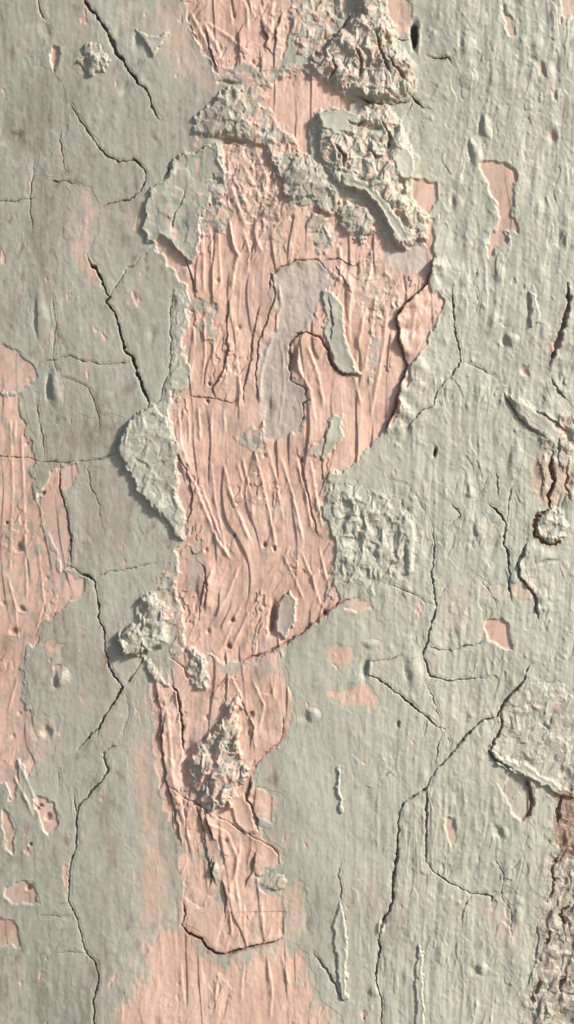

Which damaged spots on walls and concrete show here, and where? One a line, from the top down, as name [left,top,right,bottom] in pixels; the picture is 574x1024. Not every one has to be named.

crack [36,0,49,23]
crack [81,0,163,123]
crack [0,102,174,234]
peeling [478,160,520,259]
crack [405,260,499,438]
peeling [0,345,90,855]
crack [0,245,246,1024]
peeling [112,0,458,1024]
crack [235,464,535,1024]